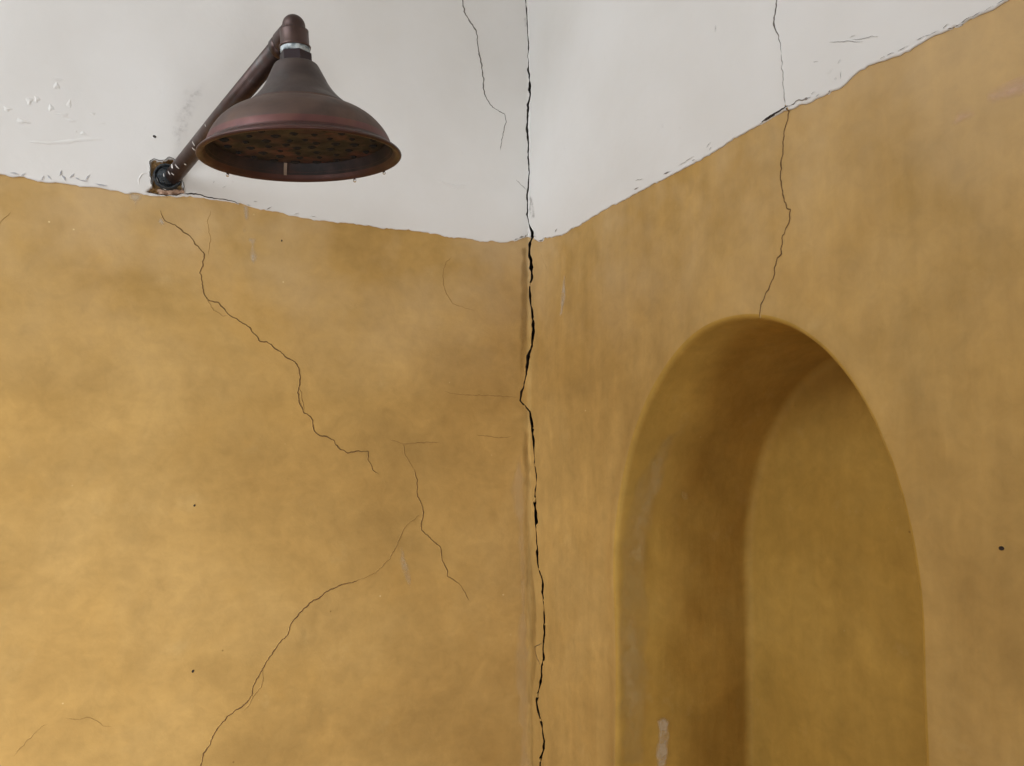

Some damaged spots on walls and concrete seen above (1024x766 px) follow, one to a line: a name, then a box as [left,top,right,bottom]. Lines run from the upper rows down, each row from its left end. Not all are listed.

crack [160,193,469,766]
crack [442,0,546,766]
crack [759,0,810,318]